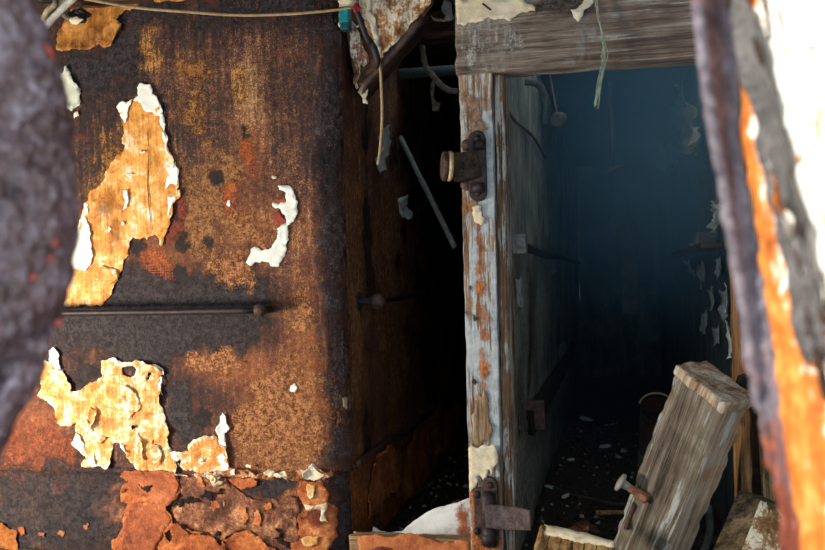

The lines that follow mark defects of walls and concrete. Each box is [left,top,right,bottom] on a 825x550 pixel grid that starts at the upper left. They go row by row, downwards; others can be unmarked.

peeling [431,0,536,66]
peeling [62,65,81,118]
corrosion [84,119,124,195]
peeling [65,83,181,307]
corrosion [138,27,278,295]
peeling [246,175,298,267]
corrosion [228,128,367,479]
corrosion [475,216,490,396]
peeling [37,347,335,482]
corrosion [185,346,242,381]
peeling [468,382,498,492]
corrosion [456,488,503,550]